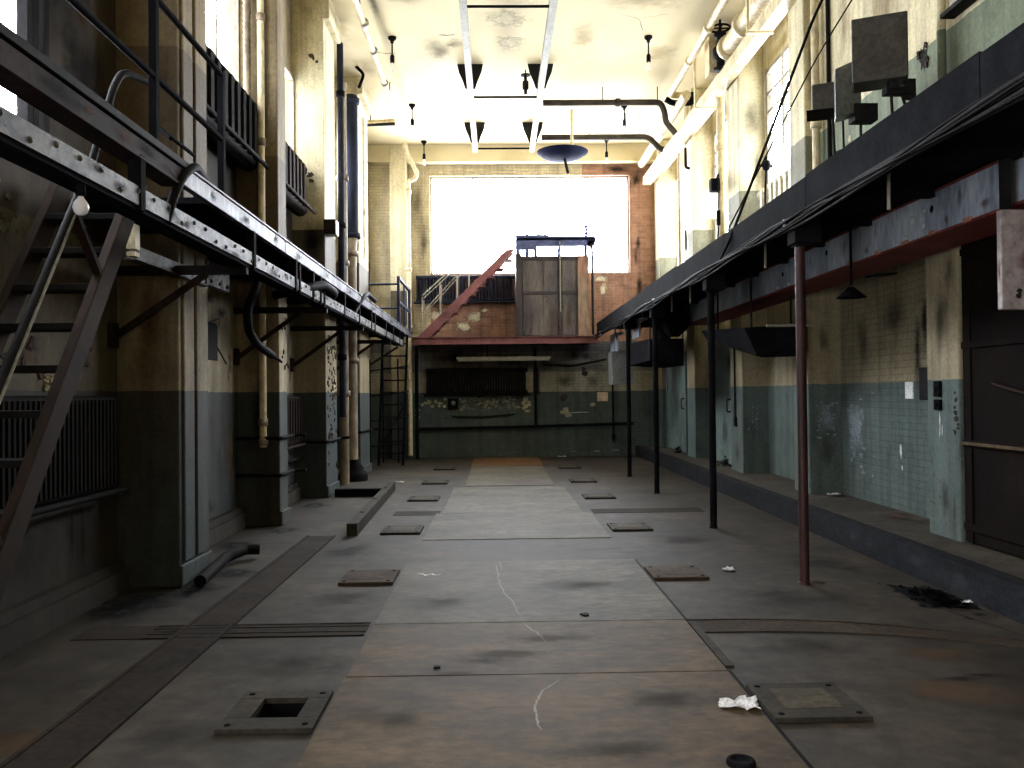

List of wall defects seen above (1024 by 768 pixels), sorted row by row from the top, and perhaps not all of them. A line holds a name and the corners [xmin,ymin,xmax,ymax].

peeling [419,396,531,418]
crack [534,681,557,729]